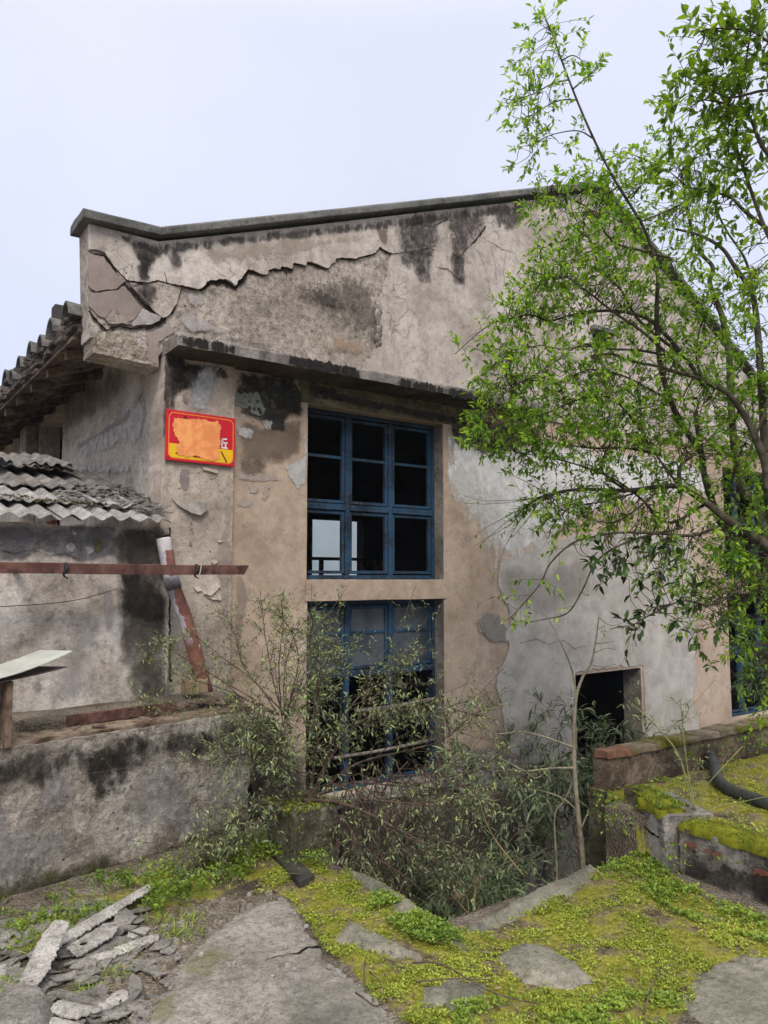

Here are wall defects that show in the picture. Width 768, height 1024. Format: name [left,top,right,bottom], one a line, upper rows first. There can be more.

spalling [87,251,181,367]
leakage [181,294,240,354]
crack [87,212,506,331]
leakage [122,202,525,303]
spalling [298,276,383,347]
leakage [164,342,540,474]
flaking render [171,498,208,515]
peeling [194,435,307,642]
peeling [447,435,708,568]
leakage [0,523,166,699]
leakage [0,724,247,798]